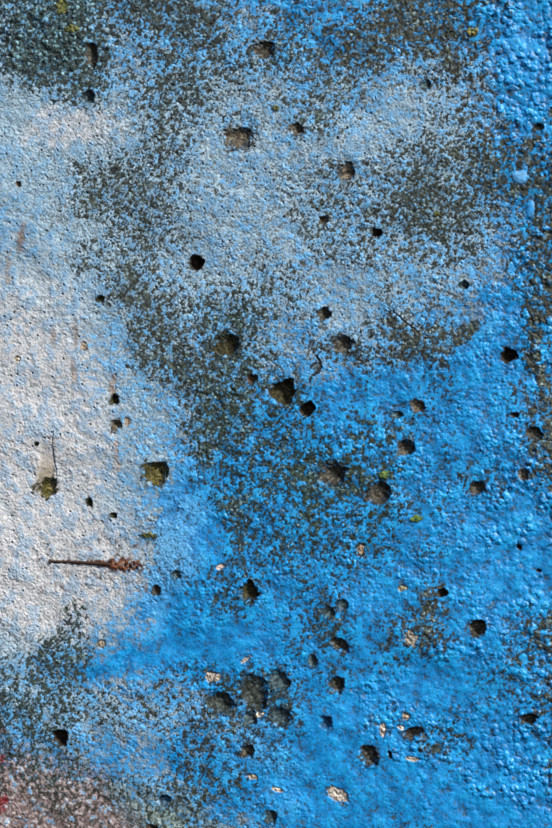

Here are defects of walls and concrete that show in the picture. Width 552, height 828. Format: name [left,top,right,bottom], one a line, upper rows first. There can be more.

rust [53,557,143,572]